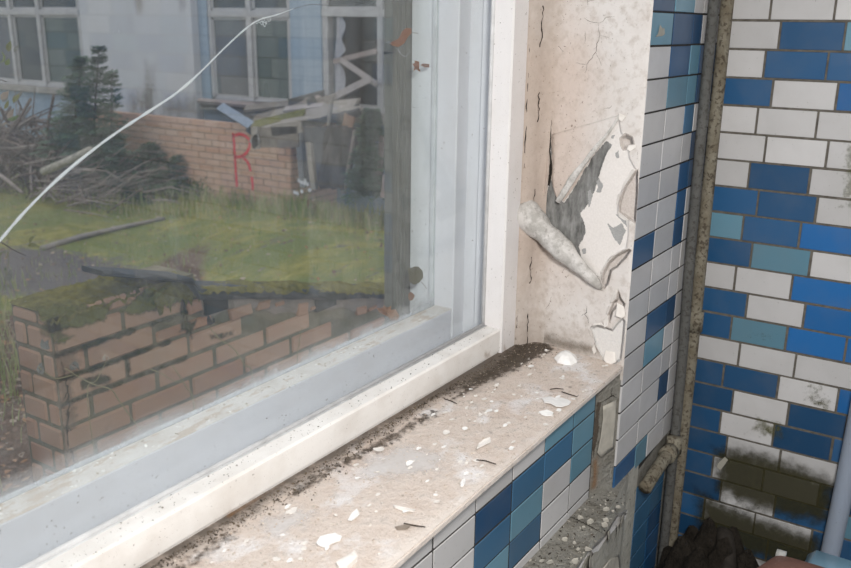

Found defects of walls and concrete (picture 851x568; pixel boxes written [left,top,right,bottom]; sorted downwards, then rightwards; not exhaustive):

peeling [517,113,638,367]
peeling [576,509,628,568]
damp [700,449,834,561]